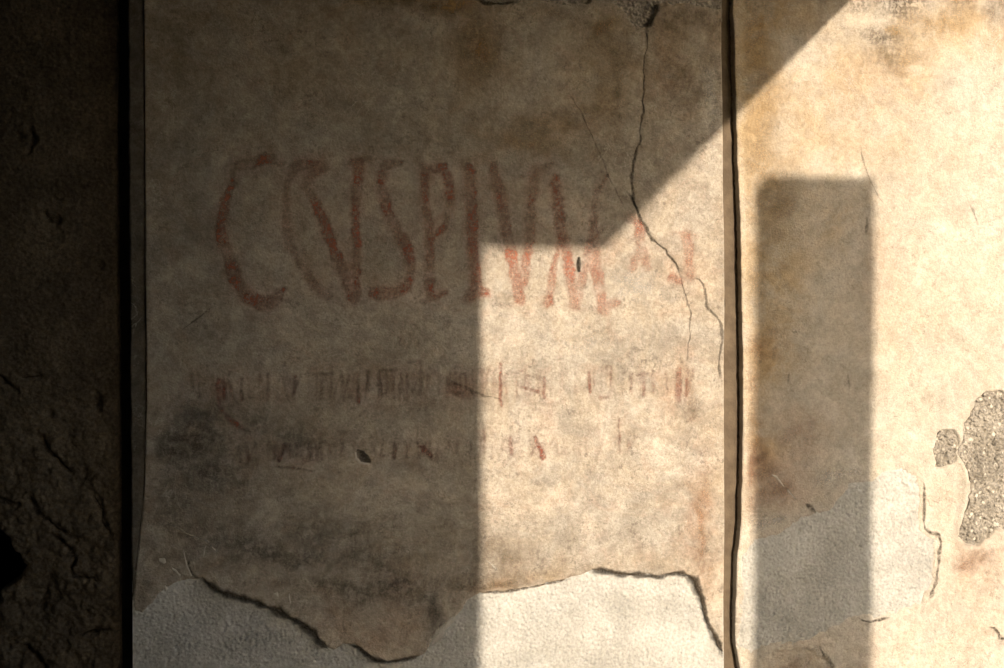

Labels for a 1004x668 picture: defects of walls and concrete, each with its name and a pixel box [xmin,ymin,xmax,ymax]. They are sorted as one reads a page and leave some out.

spalling [610,0,722,28]
crack [607,5,725,374]
spalling [933,391,1004,545]
spalling [132,550,724,668]
spalling [734,469,935,653]